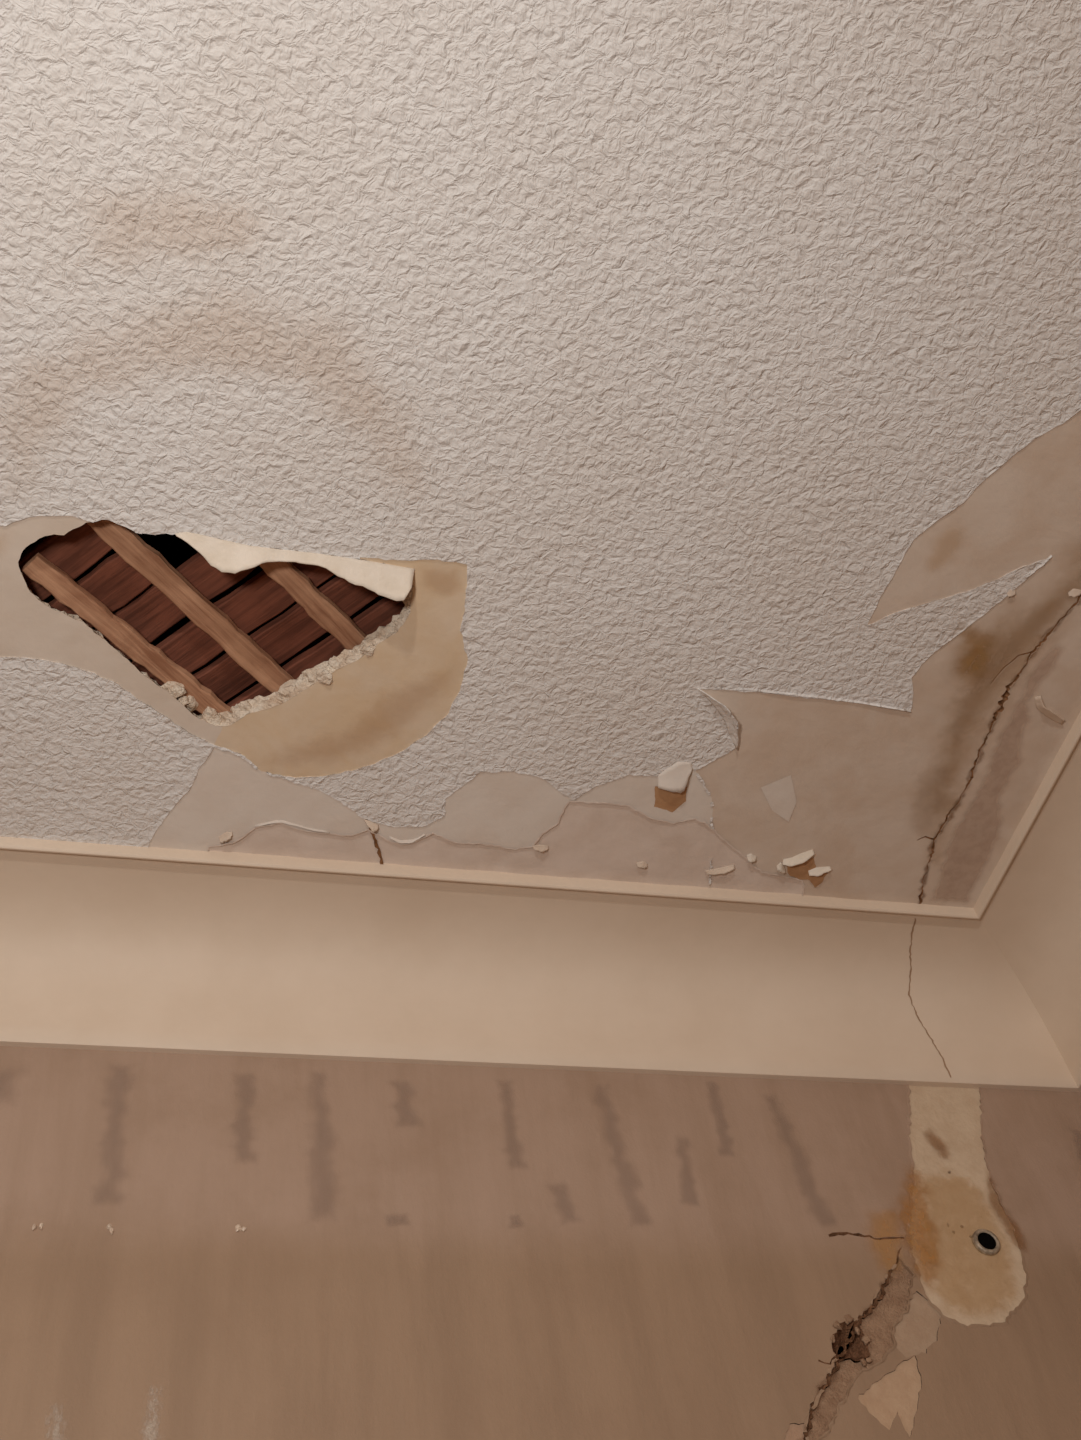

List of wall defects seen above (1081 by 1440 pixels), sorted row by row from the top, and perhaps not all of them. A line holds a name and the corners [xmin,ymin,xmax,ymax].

flaking render [18,564,414,744]
crack [365,819,383,864]
crack [908,588,1081,1077]
crack [803,1232,905,1440]